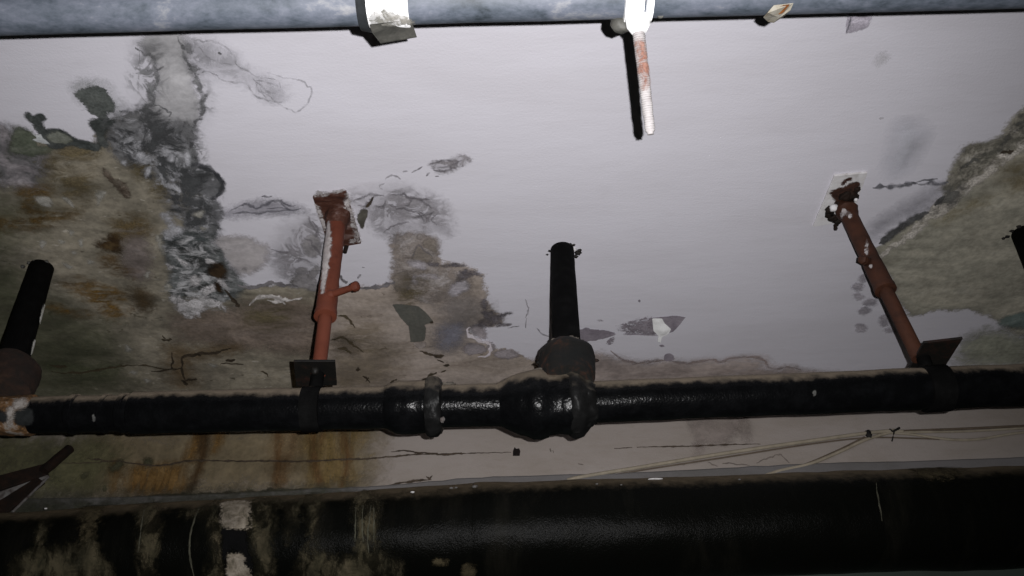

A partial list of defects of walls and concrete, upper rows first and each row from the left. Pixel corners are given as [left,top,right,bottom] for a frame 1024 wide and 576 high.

leakage [9,31,247,160]
leakage [879,142,1024,258]
leakage [95,233,122,254]
peeling [0,104,322,397]
leakage [205,236,270,275]
leakage [368,190,469,304]
leakage [169,275,229,319]
leakage [249,294,302,306]
peeling [323,233,538,387]
crack [49,335,268,386]
peeling [580,316,685,361]
crack [74,450,511,485]